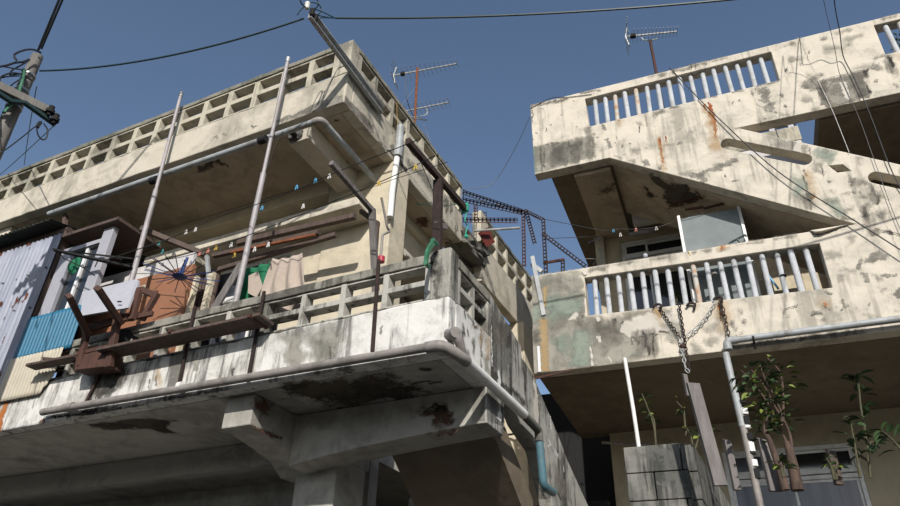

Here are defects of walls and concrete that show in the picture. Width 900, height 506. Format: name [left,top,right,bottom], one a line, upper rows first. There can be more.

water stain [862,53,900,86]
corrosion [704,102,717,138]
peeling [533,124,738,209]
water stain [462,310,525,407]
water stain [531,269,659,372]